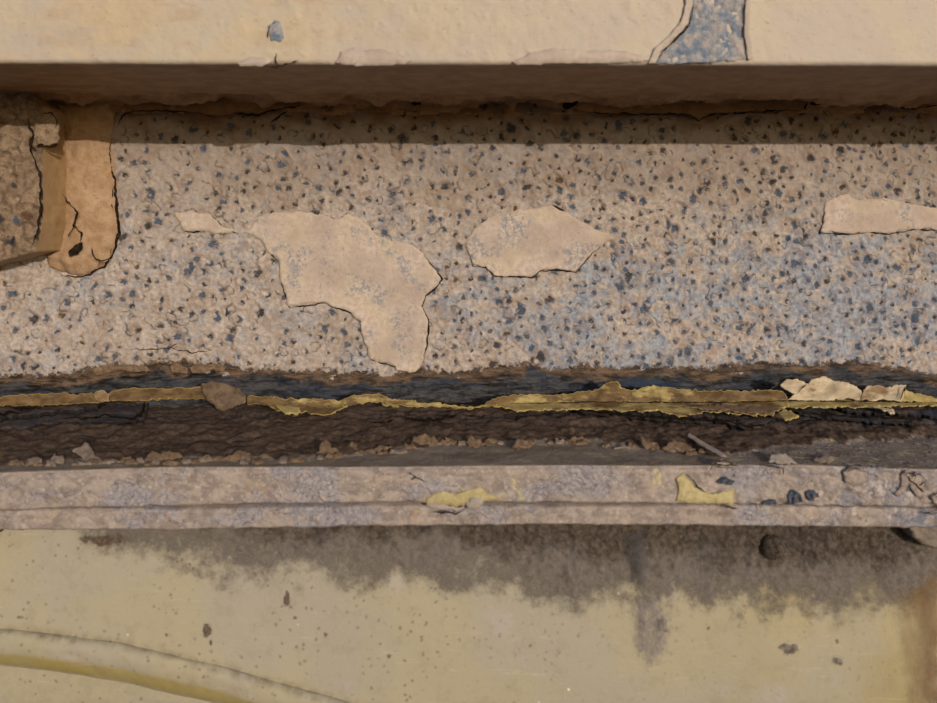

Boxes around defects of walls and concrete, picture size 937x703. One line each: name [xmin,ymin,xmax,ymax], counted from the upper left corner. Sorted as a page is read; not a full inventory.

peeling [512,0,753,65]
crack [28,116,121,278]
peeling [0,97,937,423]
peeling [8,442,304,467]
peeling [316,433,535,460]
peeling [548,436,589,446]
peeling [602,436,730,456]
peeling [425,486,502,515]
peeling [676,473,738,509]
spalling [788,490,819,505]